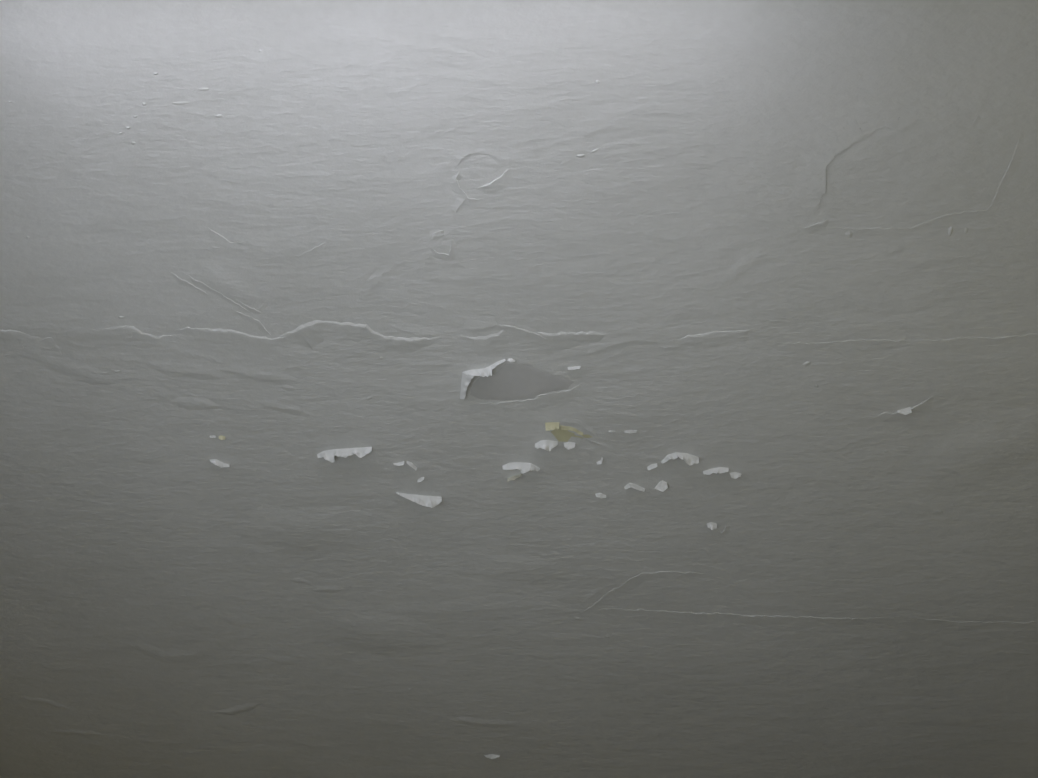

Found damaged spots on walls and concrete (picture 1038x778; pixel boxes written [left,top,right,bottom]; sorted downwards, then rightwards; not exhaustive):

peeling [460,350,637,464]
peeling [317,447,372,463]
peeling [393,461,442,508]
peeling [502,462,540,482]
peeling [624,481,668,492]
peeling [647,452,741,479]